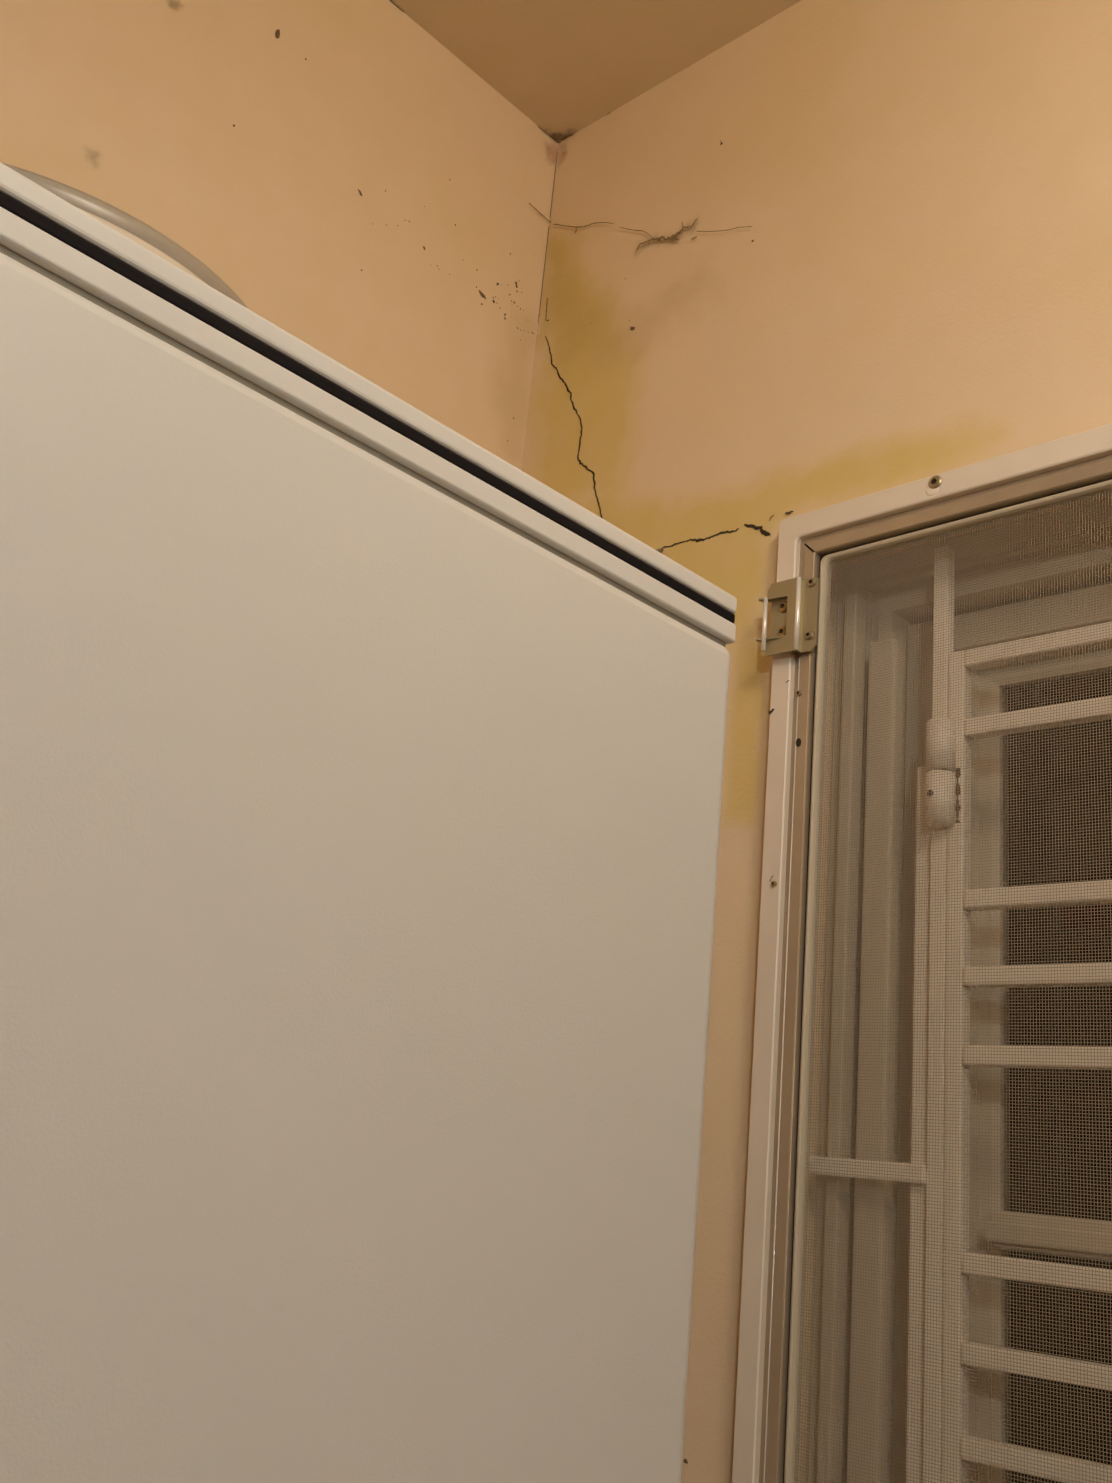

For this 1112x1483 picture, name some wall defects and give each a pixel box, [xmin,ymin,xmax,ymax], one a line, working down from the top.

crack [538,151,603,519]
crack [662,511,793,548]